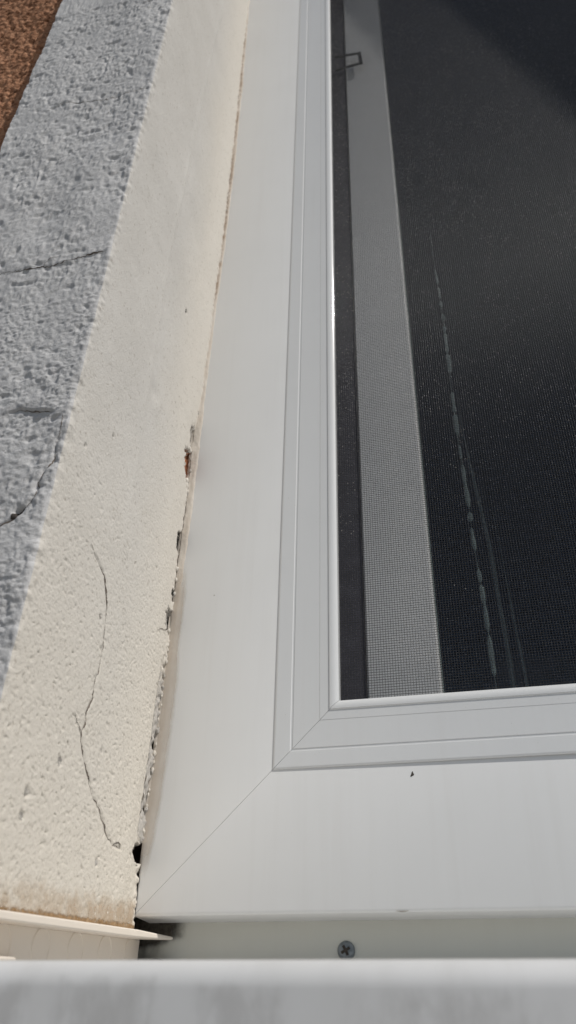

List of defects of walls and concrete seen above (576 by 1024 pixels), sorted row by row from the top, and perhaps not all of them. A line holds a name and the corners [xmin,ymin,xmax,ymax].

crack [5,251,103,273]
crack [0,414,63,526]
crack [75,543,121,849]